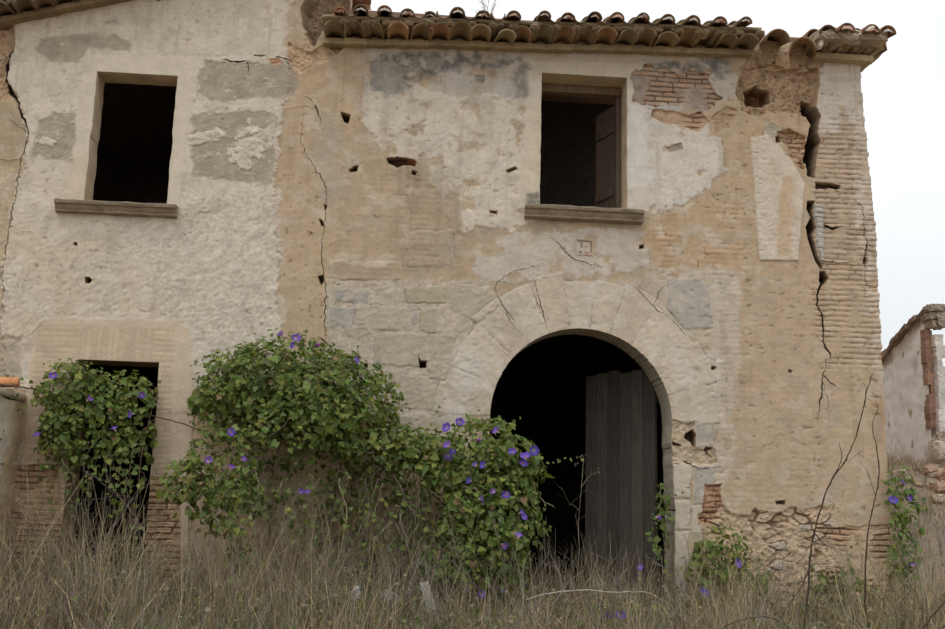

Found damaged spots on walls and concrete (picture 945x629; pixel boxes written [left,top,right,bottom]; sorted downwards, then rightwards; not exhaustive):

crack [0,48,36,318]
peeling [0,15,138,106]
crack [218,51,296,76]
peeling [180,0,353,192]
crack [283,91,331,353]
crack [490,233,604,331]
crack [627,276,689,339]
flaking render [625,45,826,264]
flaking render [671,416,892,621]